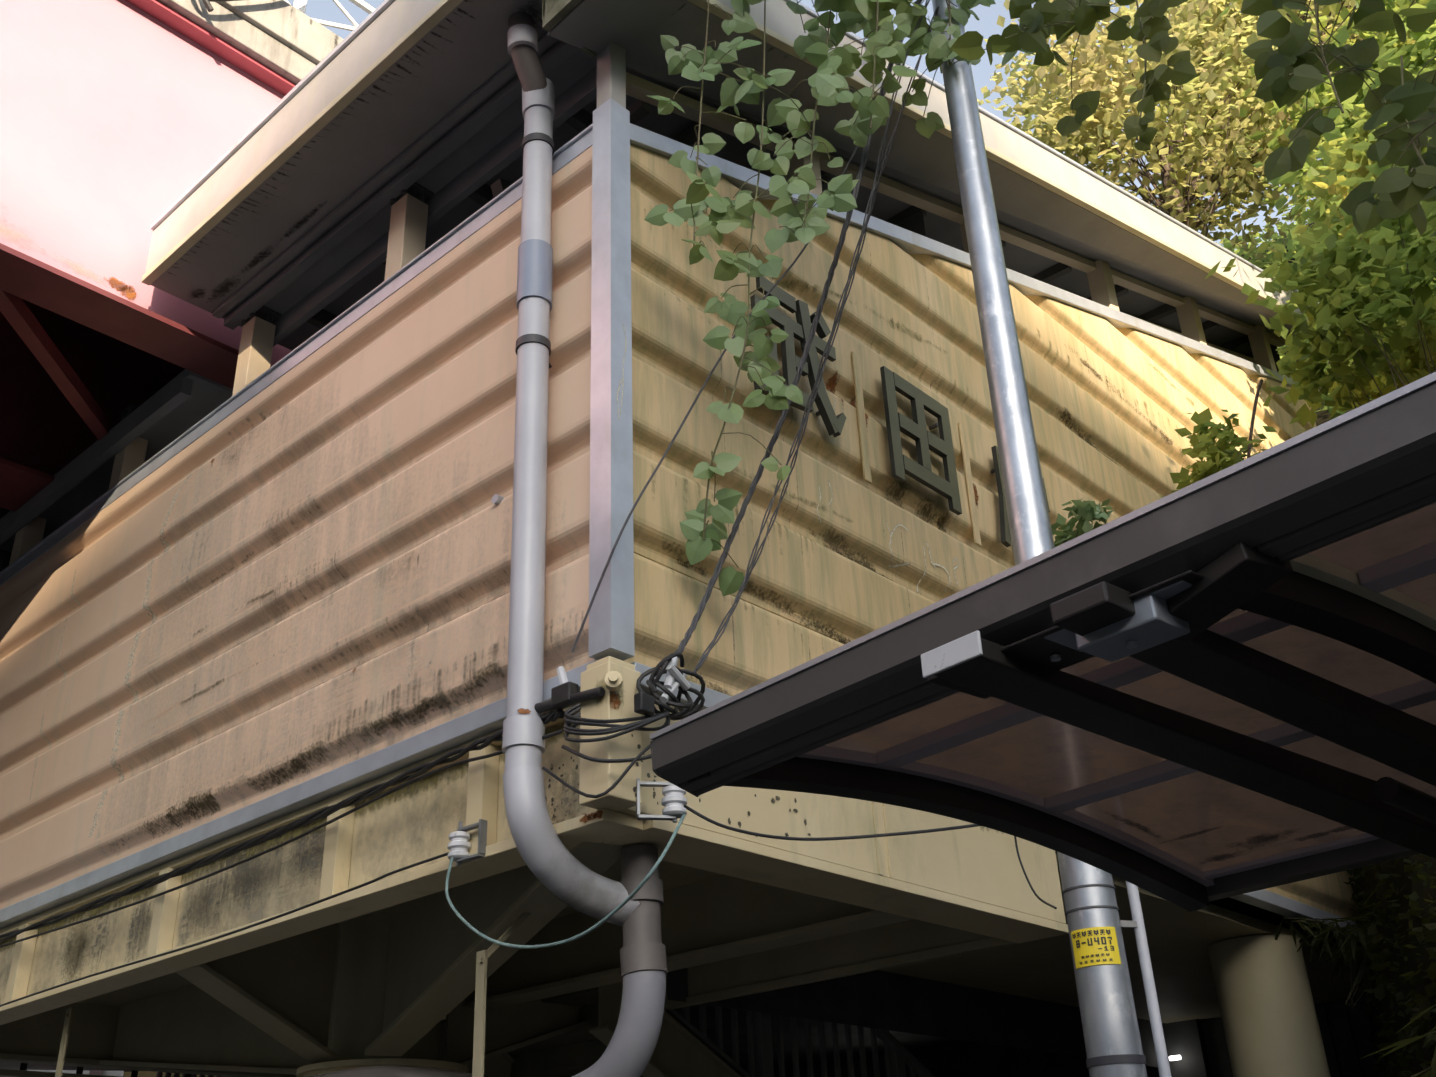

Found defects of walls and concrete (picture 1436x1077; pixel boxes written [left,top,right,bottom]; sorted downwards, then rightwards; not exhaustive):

corrosion [107,277,136,300]
leakage [354,764,464,814]
corrosion [580,810,603,823]
leakage [246,817,327,858]